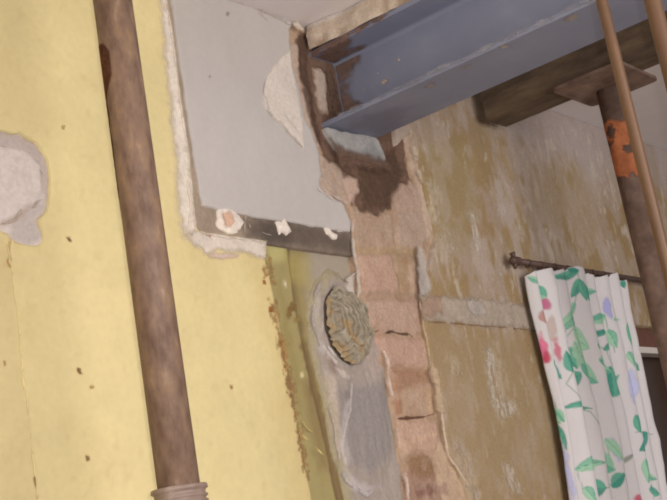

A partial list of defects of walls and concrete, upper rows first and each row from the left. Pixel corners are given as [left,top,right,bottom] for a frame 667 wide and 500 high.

corrosion [311,14,386,113]
peeling [161,0,270,259]
peeling [0,131,49,246]
spalling [289,0,480,500]
crack [370,330,413,338]
crack [397,407,435,420]